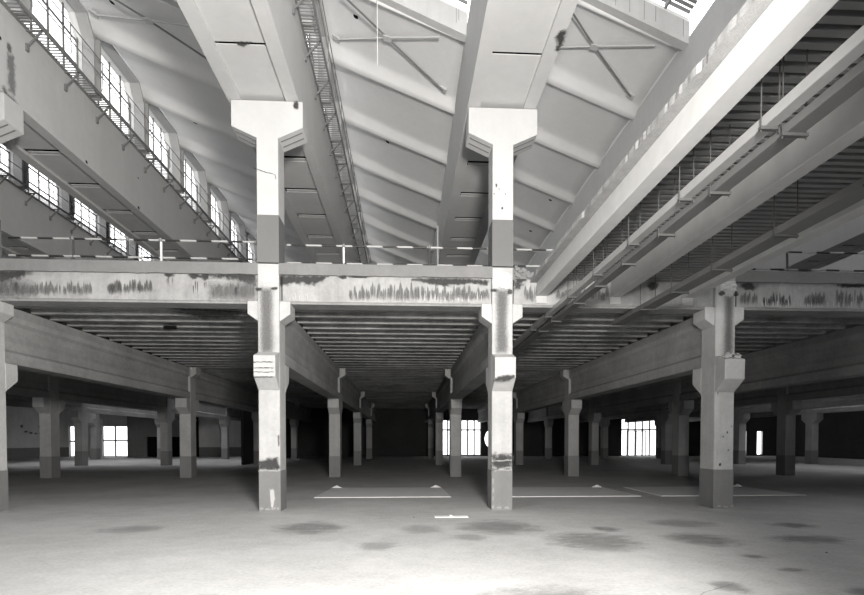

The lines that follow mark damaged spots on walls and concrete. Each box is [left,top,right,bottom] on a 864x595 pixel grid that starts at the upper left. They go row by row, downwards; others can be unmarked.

leakage [0,271,92,295]
leakage [108,280,152,292]
leakage [174,274,256,319]
leakage [280,275,488,302]
spalling [720,281,737,291]
leakage [740,283,864,308]